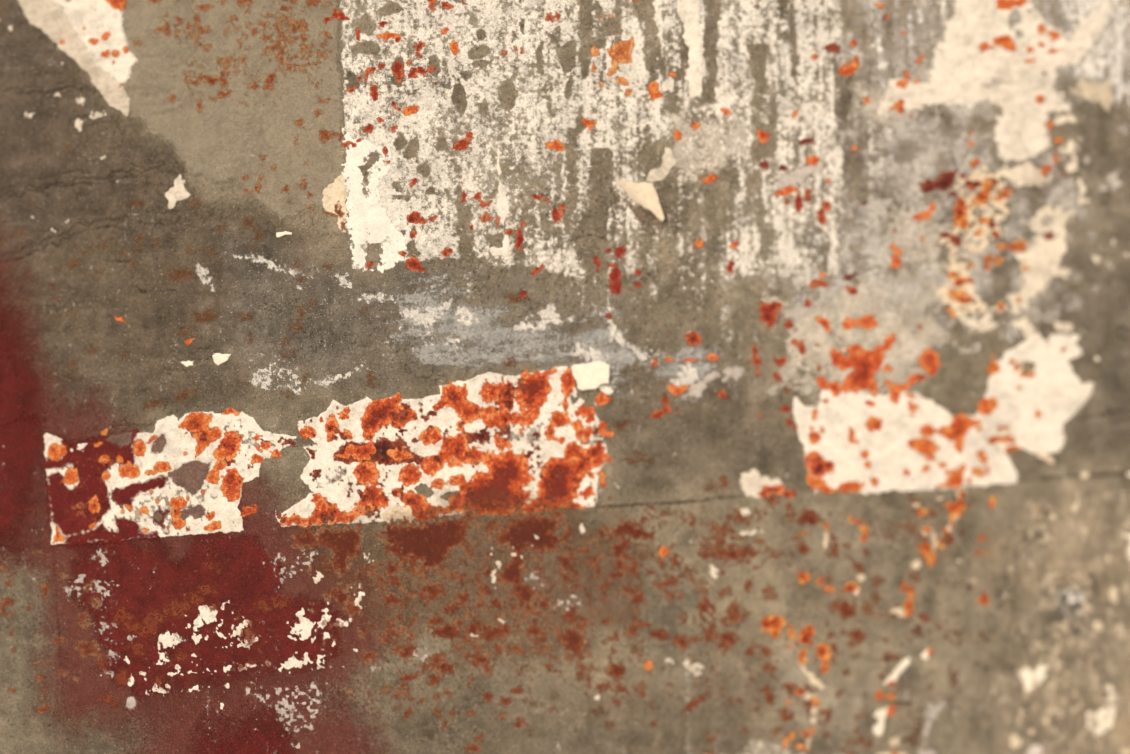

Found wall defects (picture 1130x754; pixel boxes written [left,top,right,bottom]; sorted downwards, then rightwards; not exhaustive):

corrosion [148,0,436,148]
corrosion [811,40,859,76]
peeling [119,0,924,353]
corrosion [774,186,831,225]
corrosion [912,131,1030,318]
peeling [571,354,613,408]
peeling [168,460,210,520]
corrosion [32,272,1021,754]
crack [597,496,749,507]
peeling [732,468,790,516]
peeling [95,583,366,748]
peeling [979,471,1130,754]